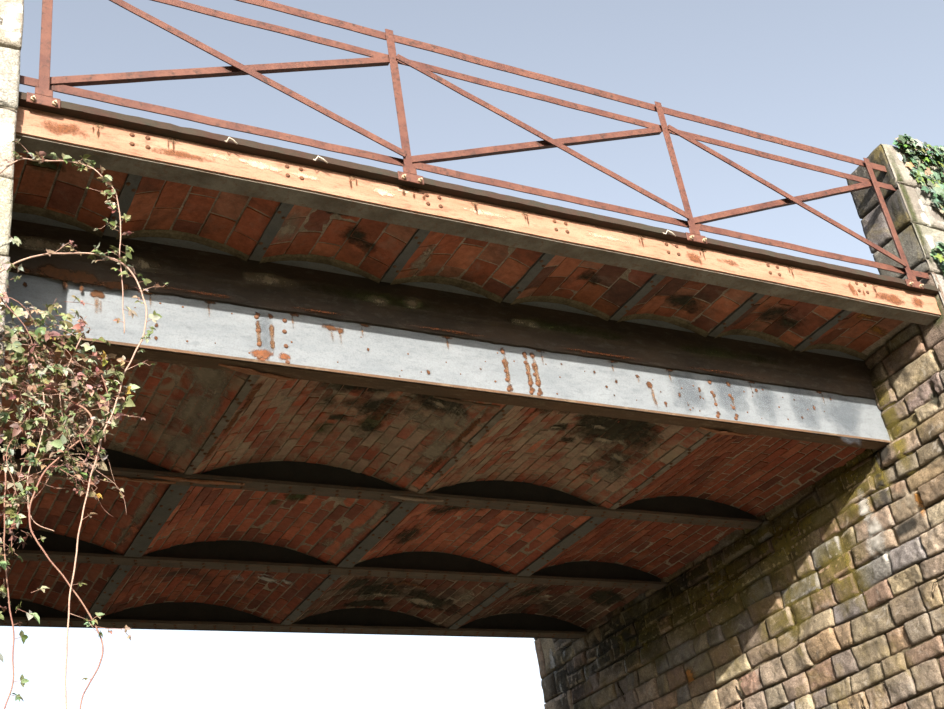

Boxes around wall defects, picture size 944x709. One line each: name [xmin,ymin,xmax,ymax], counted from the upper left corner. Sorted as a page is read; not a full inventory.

rust [143,286,227,309]
rust [290,307,344,337]
rust [523,350,544,395]
rust [567,348,634,396]
water stain [322,382,469,478]
water stain [534,412,660,480]